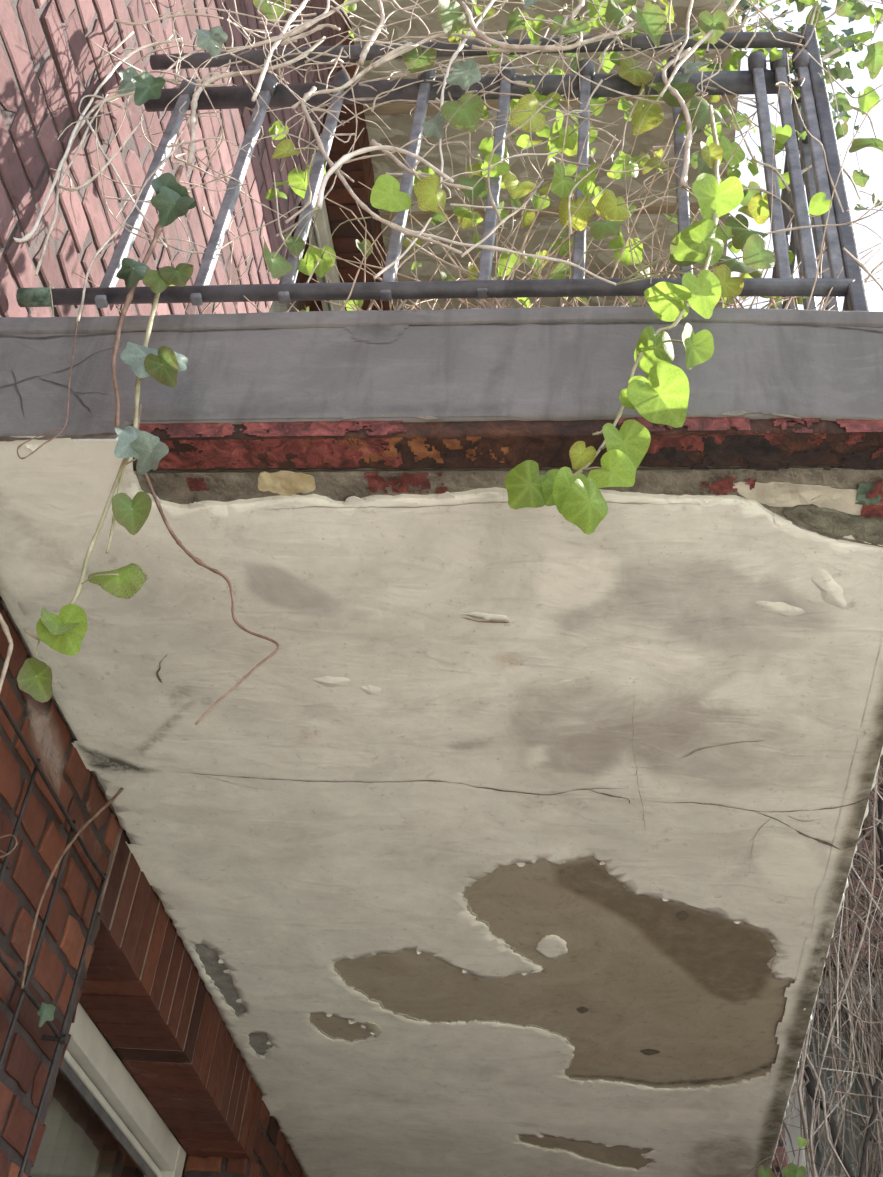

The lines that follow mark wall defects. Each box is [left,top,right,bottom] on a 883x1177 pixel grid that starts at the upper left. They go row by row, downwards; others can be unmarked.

peeling [131,412,511,509]
peeling [618,410,883,454]
flaking render [599,448,883,549]
crack [183,772,373,790]
crack [406,697,877,850]
flaking render [192,944,247,1017]
flaking render [333,857,795,1090]
flaking render [248,1033,274,1057]
flaking render [309,1013,382,1043]
flaking render [519,1135,655,1170]